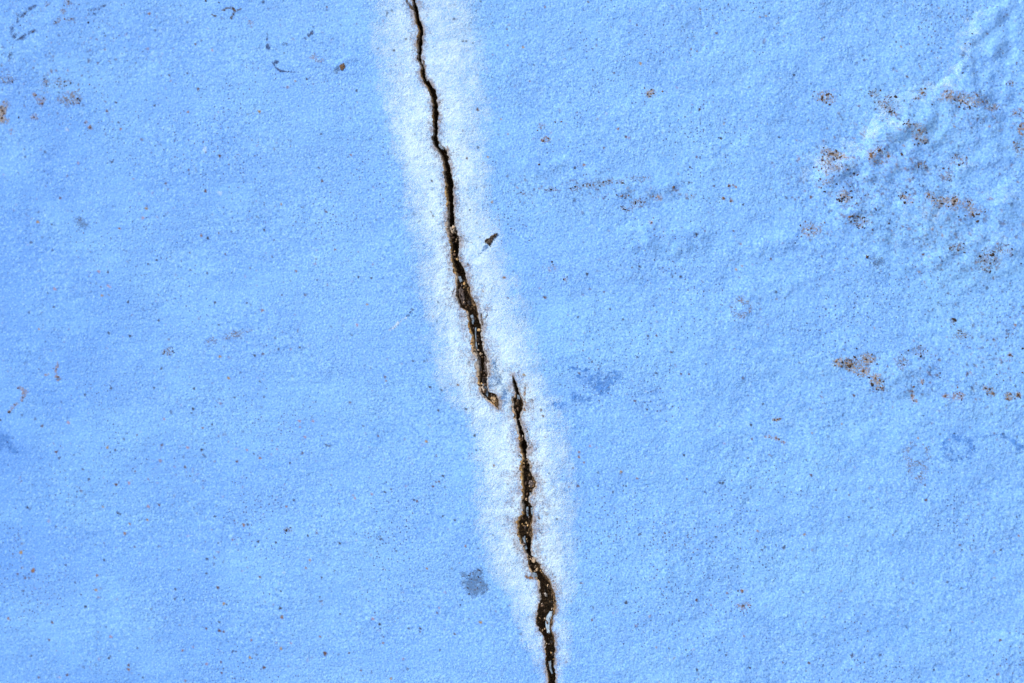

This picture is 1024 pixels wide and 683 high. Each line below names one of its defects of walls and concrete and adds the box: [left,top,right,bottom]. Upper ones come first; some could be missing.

water stain [359,0,585,683]
crack [400,0,566,683]